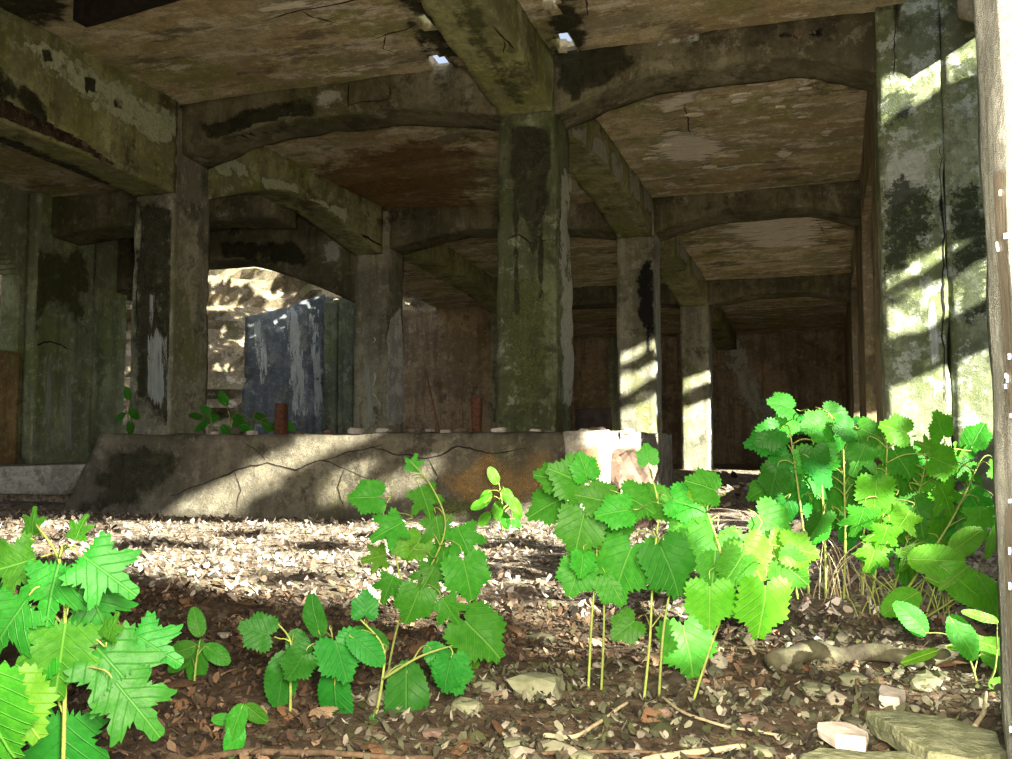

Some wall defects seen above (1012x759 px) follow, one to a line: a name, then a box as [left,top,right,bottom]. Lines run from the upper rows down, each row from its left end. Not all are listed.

leakage [0,68,47,123]
leakage [200,90,341,141]
leakage [546,0,634,101]
leakage [510,126,551,314]
leakage [559,168,574,407]
leakage [80,445,179,512]
crack [170,441,525,511]
peeling [1004,499,1012,699]